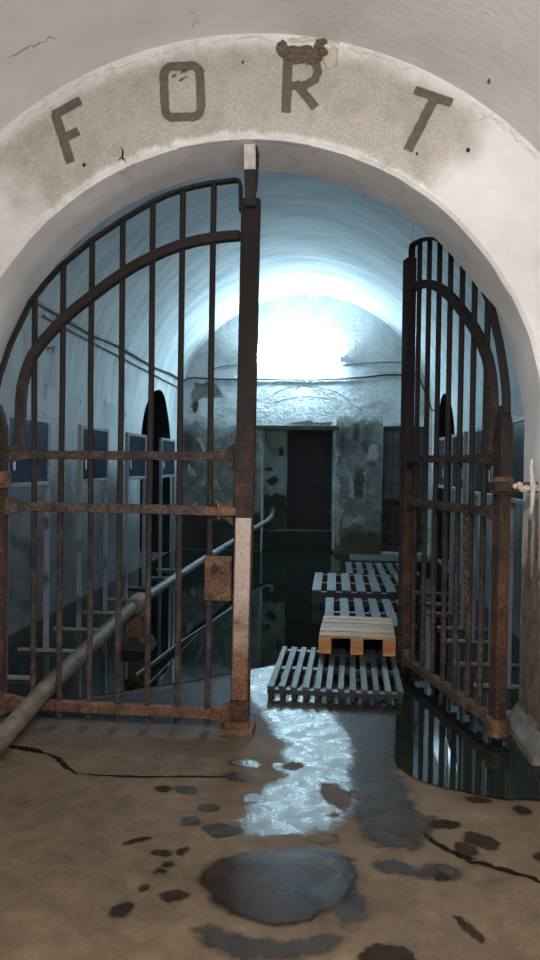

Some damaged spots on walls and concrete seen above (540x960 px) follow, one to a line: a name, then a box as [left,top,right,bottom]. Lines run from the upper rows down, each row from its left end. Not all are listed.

crack [7,36,57,58]
spalling [191,382,222,413]
damp [334,419,383,554]
crack [9,745,225,778]
damp [374,859,462,881]
crack [421,832,540,883]